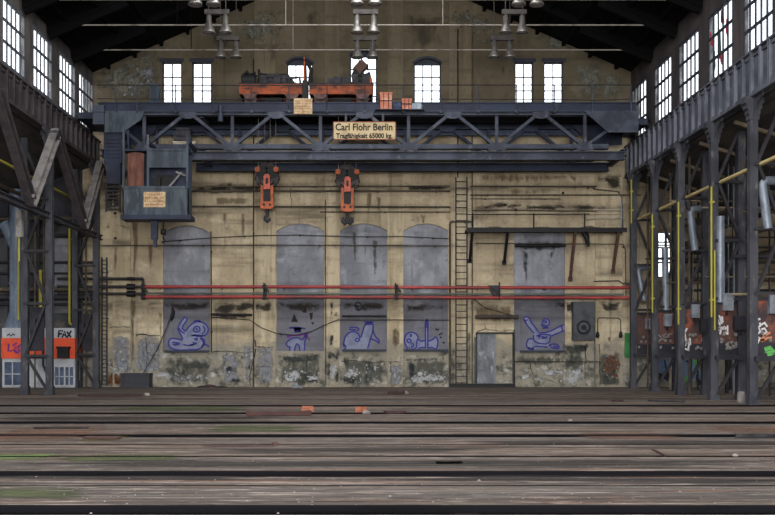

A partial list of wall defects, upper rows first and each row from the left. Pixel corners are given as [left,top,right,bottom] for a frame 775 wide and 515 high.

water stain [169,361,210,381]
peeling [109,336,274,384]
water stain [283,335,381,384]
peeling [330,364,446,385]
water stain [409,358,454,383]
peeling [522,366,586,386]